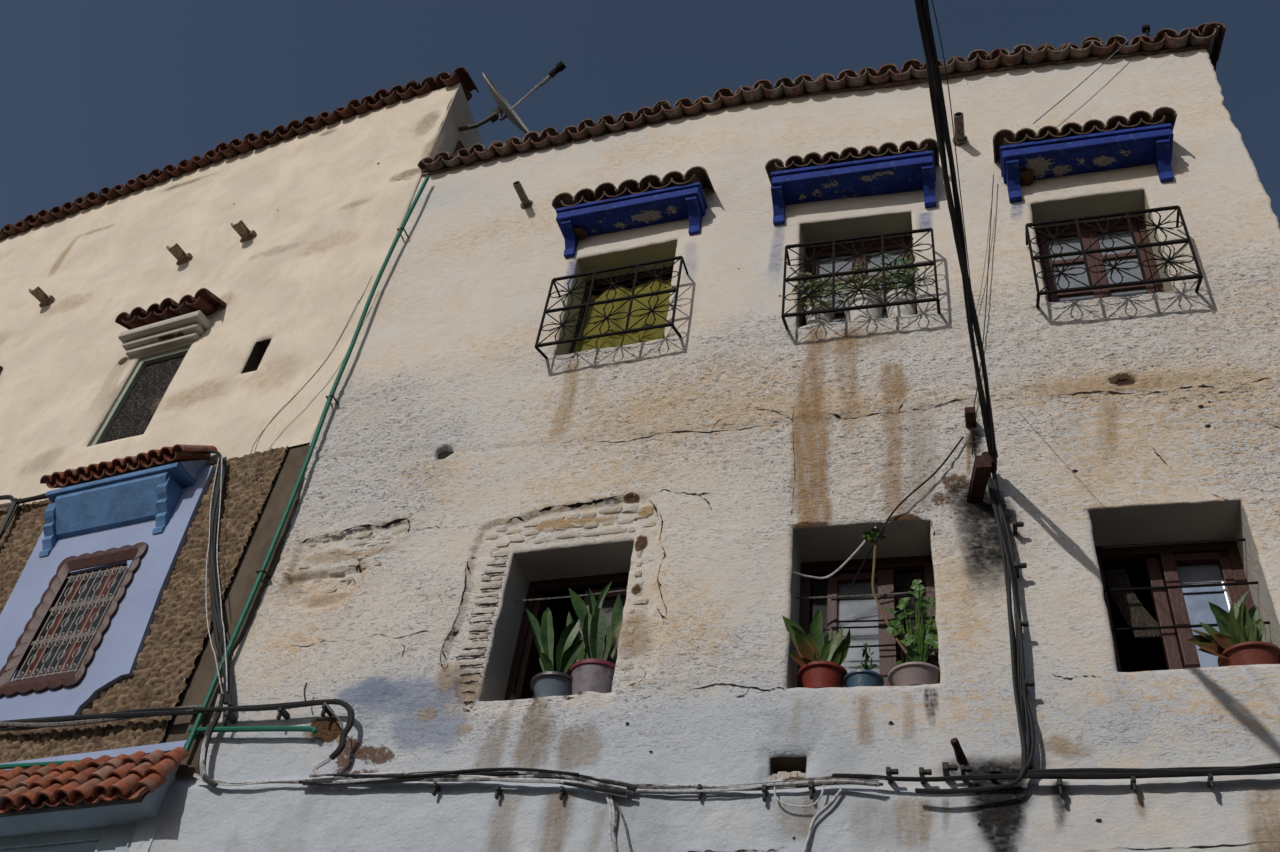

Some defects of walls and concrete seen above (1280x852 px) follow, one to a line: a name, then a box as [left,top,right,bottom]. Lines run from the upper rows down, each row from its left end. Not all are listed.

peeling [574,206,680,239]
peeling [799,171,893,200]
peeling [1019,150,1131,186]
crack [1060,375,1280,395]
corrosion [791,330,829,527]
corrosion [886,417,919,520]
flaking render [295,518,410,593]
water stain [959,496,1013,577]
flaking render [442,492,666,710]
water stain [967,767,1028,852]